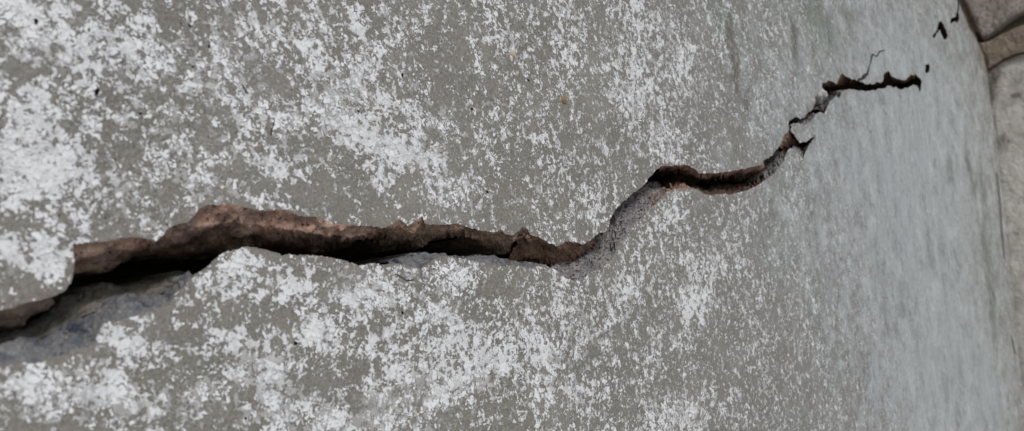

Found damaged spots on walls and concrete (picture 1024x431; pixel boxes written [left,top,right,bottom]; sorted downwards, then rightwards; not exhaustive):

crack [0,0,959,367]